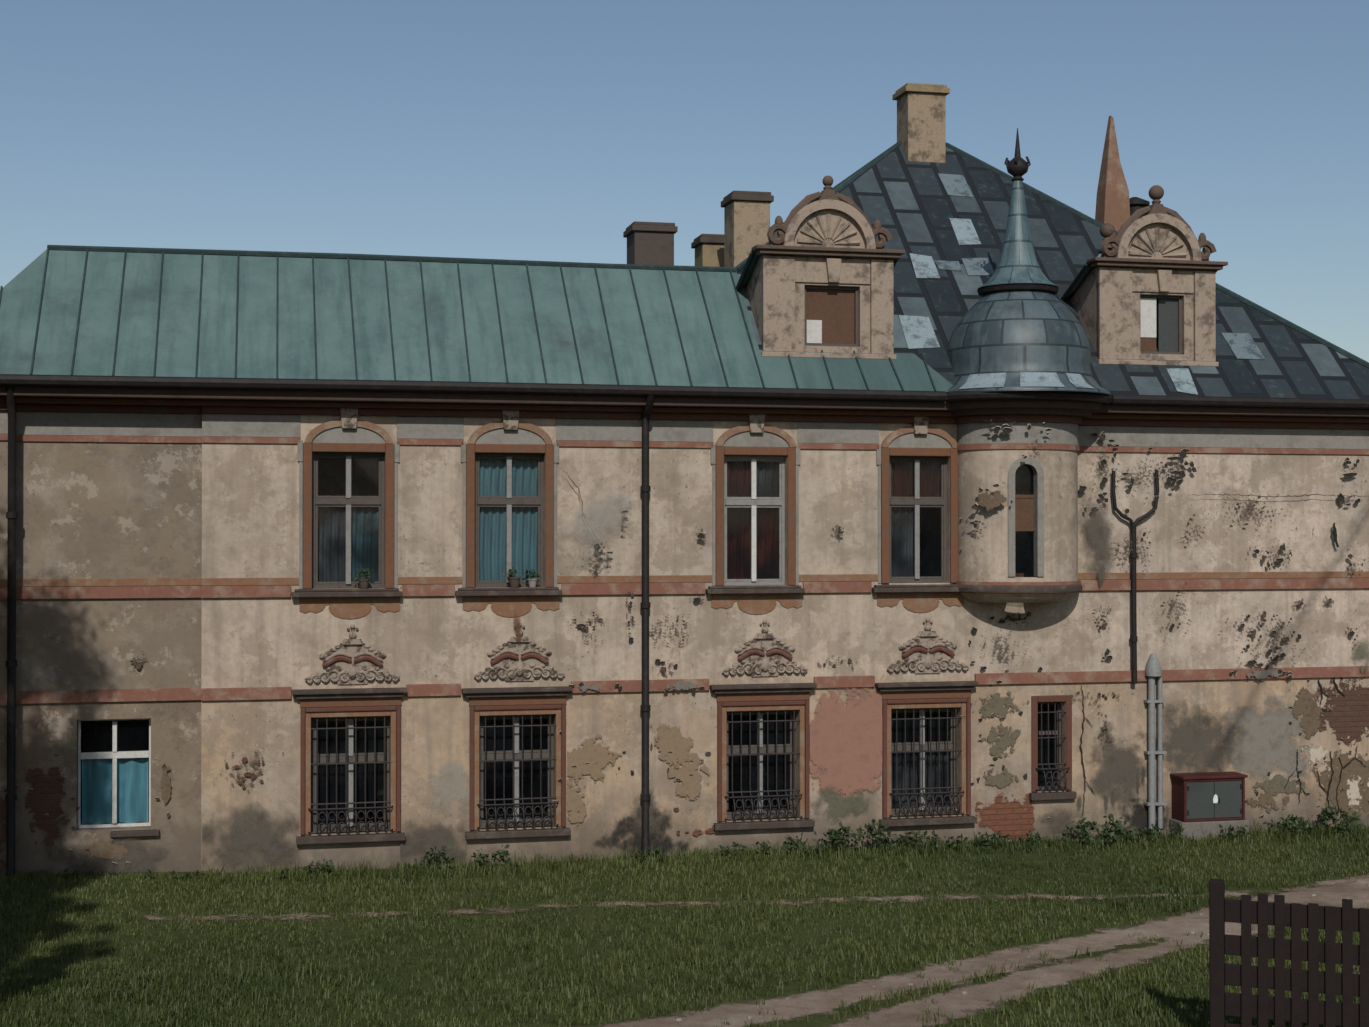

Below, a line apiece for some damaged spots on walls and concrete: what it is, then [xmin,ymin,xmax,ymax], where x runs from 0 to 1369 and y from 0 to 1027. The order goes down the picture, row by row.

peeling [959,483,1013,531]
spalling [1078,431,1199,514]
flaking render [15,753,131,868]
spalling [220,745,284,792]
peeling [552,734,634,827]
water stain [598,793,688,858]
peeling [650,723,711,812]
flaking render [960,610,1050,840]
flaking render [1219,598,1369,829]